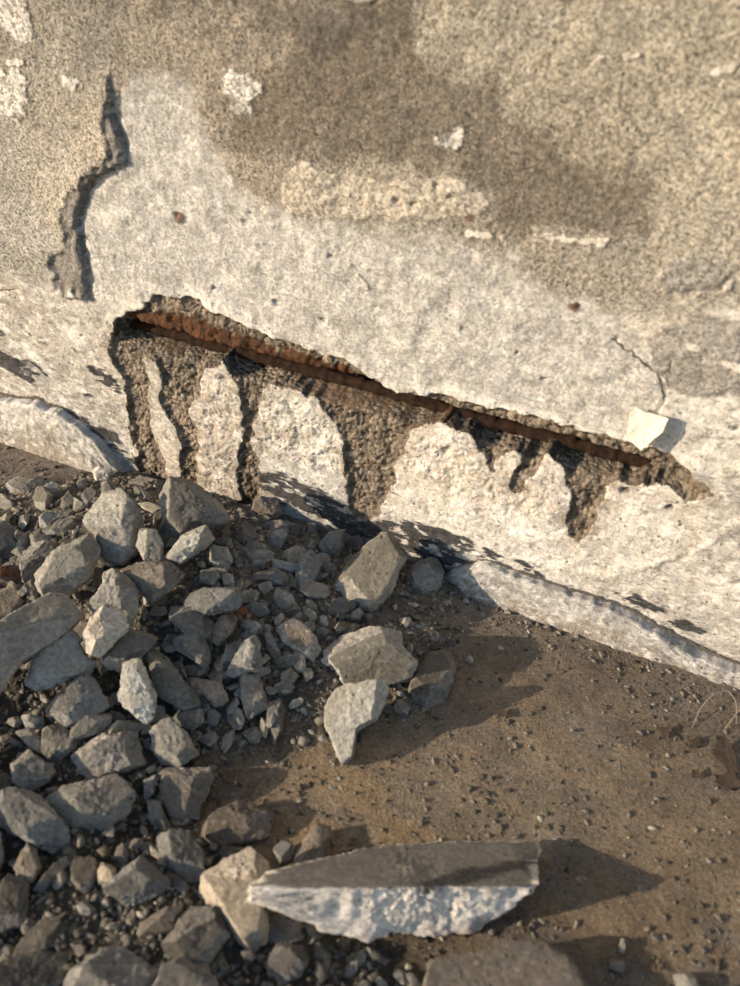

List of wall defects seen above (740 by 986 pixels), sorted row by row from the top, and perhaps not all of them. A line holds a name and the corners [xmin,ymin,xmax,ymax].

water stain [464,228,504,239]
water stain [534,232,609,248]
rust [128,310,362,376]
peeling [49,79,714,543]
crack [609,336,672,410]